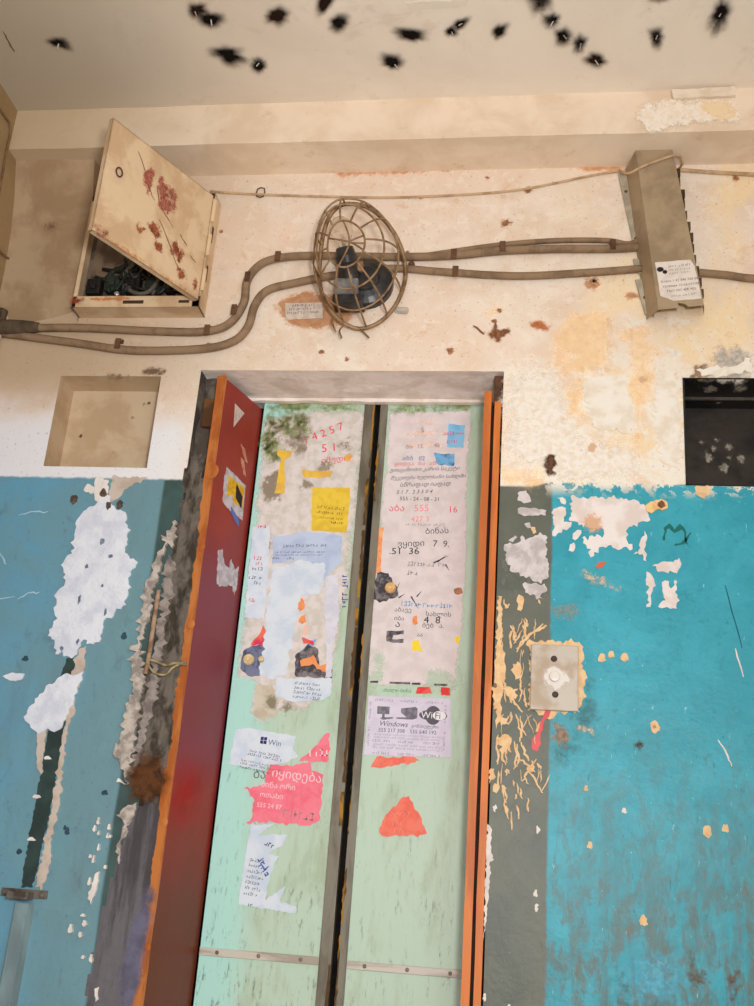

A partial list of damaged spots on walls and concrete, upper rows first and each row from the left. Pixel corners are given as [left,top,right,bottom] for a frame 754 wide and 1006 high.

peeling [636,98,740,133]
corrosion [473,308,511,342]
peeling [70,475,147,510]
spalling [113,454,204,786]
peeling [495,596,503,653]
peeling [598,651,629,662]
peeling [492,639,587,752]
spalling [68,802,161,1006]